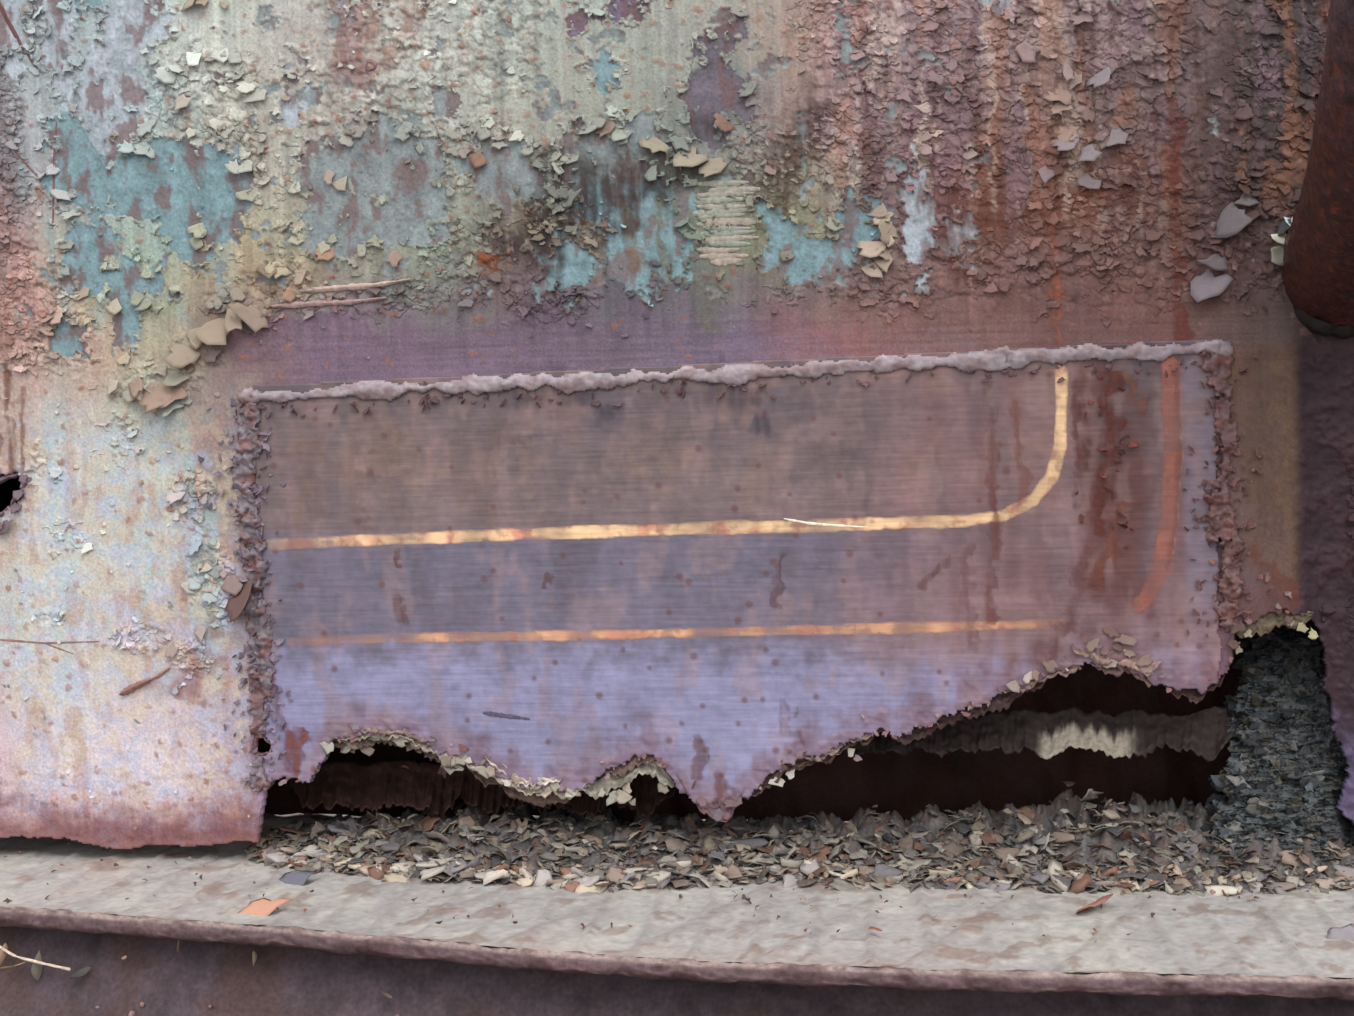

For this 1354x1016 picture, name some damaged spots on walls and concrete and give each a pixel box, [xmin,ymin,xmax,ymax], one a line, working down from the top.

peeling [0,0,1330,535]
peeling [31,516,107,644]
peeling [108,537,254,695]
peeling [1085,634,1154,677]
peeling [1227,623,1252,655]
peeling [1285,615,1318,639]
peeling [1006,659,1060,693]
peeling [834,741,862,762]
peeling [537,774,636,806]
peeling [646,760,669,794]
peeling [768,769,795,787]
peeling [696,795,742,822]